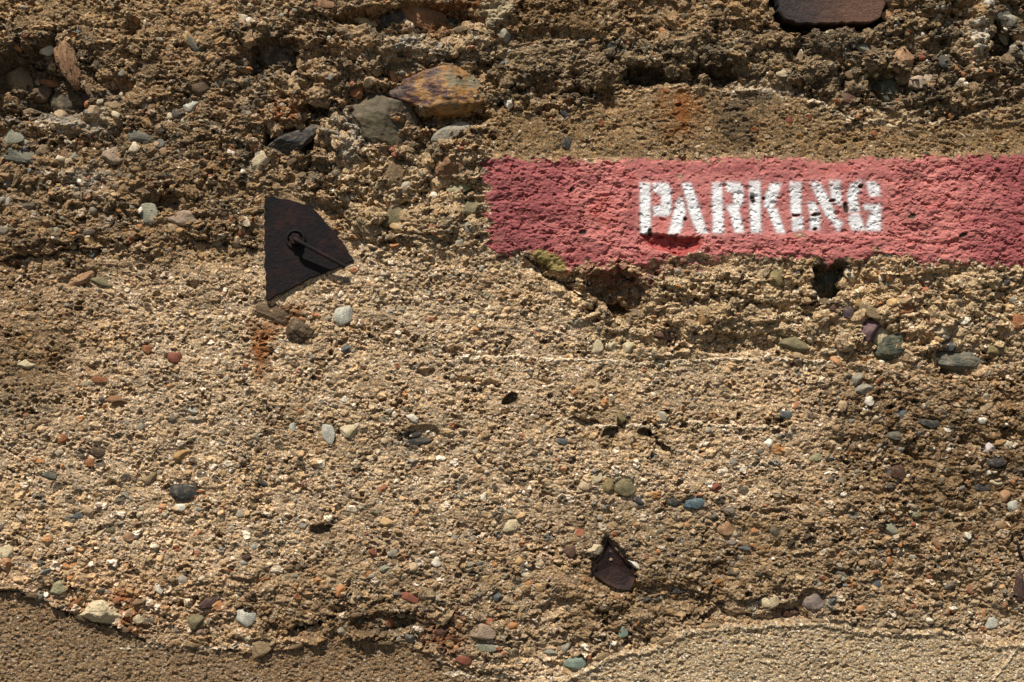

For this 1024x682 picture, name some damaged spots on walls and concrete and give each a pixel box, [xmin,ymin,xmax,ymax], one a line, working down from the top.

corrosion [251,308,301,379]